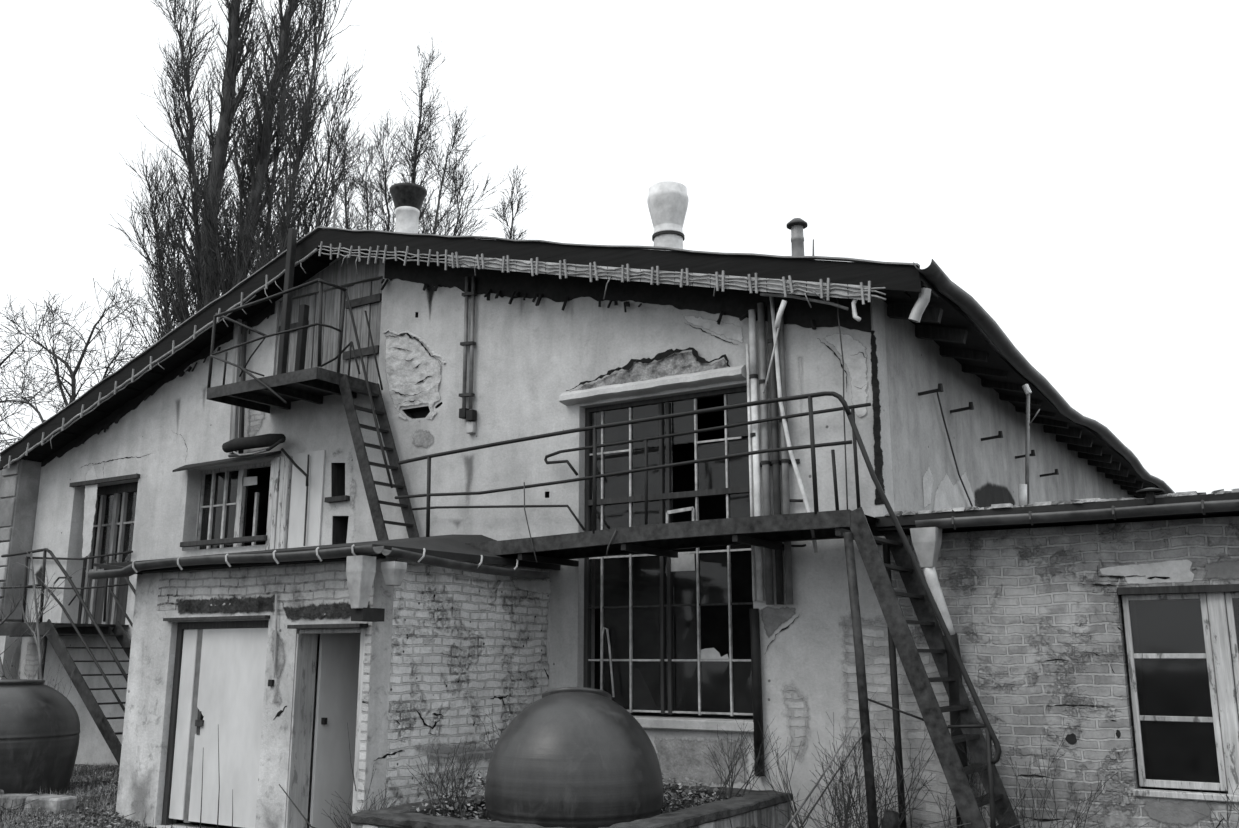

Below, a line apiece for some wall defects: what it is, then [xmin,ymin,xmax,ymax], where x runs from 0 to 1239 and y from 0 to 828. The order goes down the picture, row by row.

flaking render [382,328,446,421]
flaking render [566,316,743,392]
flaking render [1081,559,1194,586]
flaking render [761,607,799,655]
flaking render [417,744,494,768]